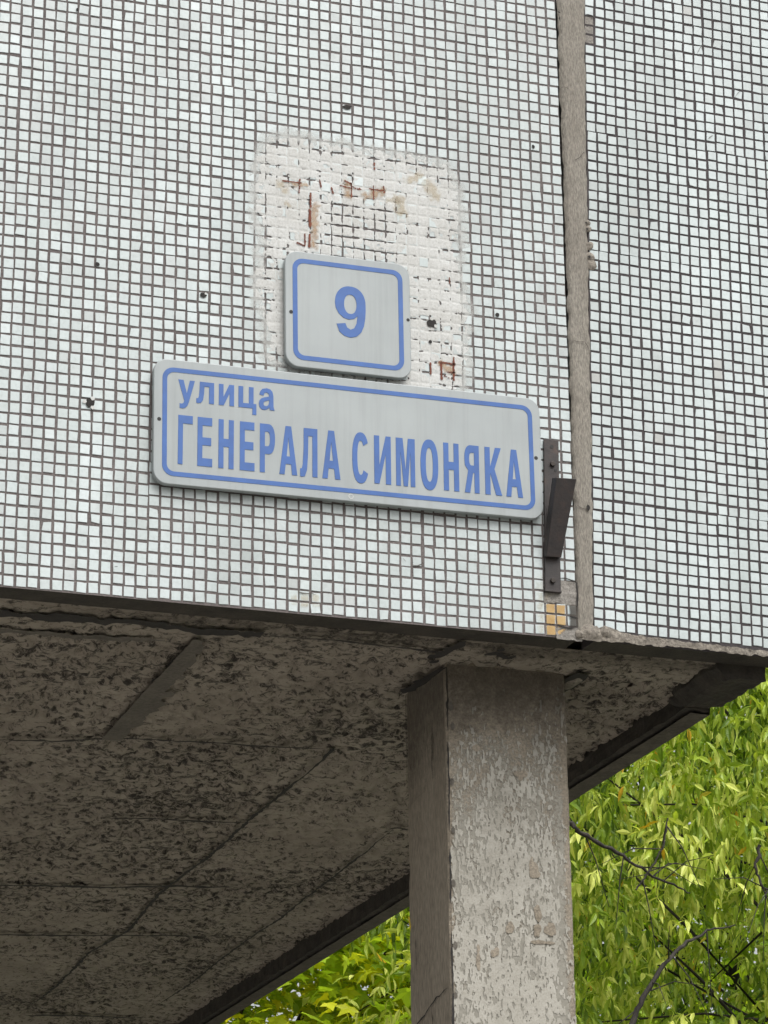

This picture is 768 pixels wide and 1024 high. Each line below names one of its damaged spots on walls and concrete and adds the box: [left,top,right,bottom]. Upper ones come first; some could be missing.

corrosion [282,179,385,248]
peeling [250,129,472,391]
corrosion [429,357,455,381]
spalling [544,578,768,657]